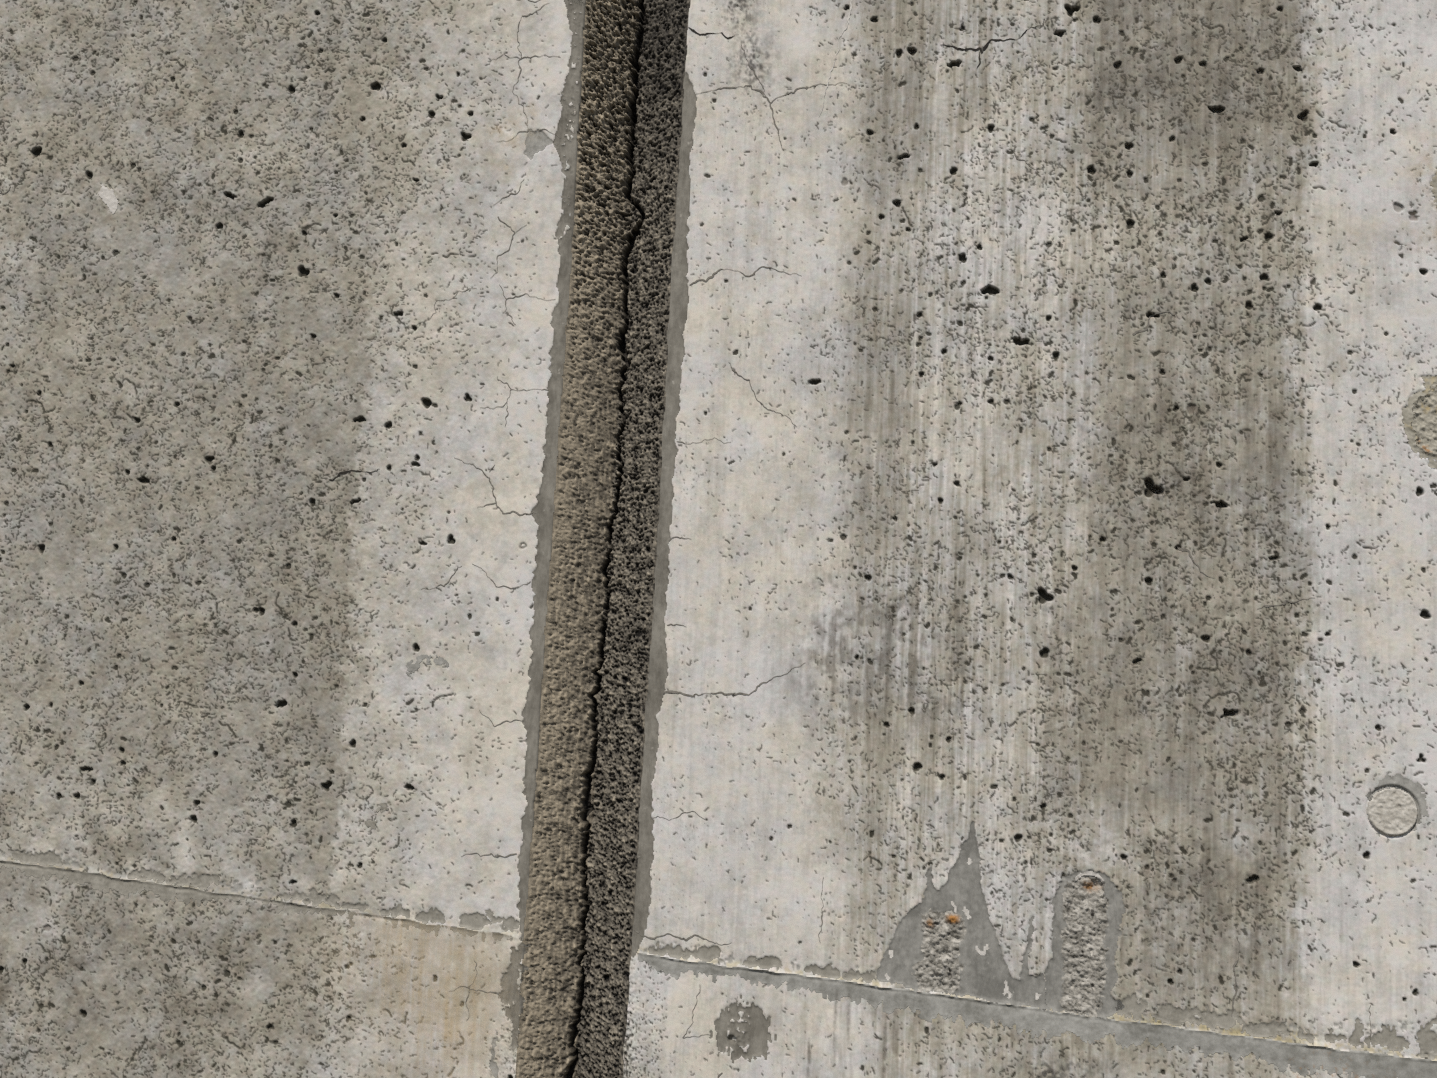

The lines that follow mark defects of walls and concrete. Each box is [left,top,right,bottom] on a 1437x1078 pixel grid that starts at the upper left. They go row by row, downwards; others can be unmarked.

crack [490,0,560,142]
crack [415,181,555,327]
crack [480,378,547,425]
crack [454,457,535,516]
crack [422,564,531,590]
peeling [631,72,1437,1078]